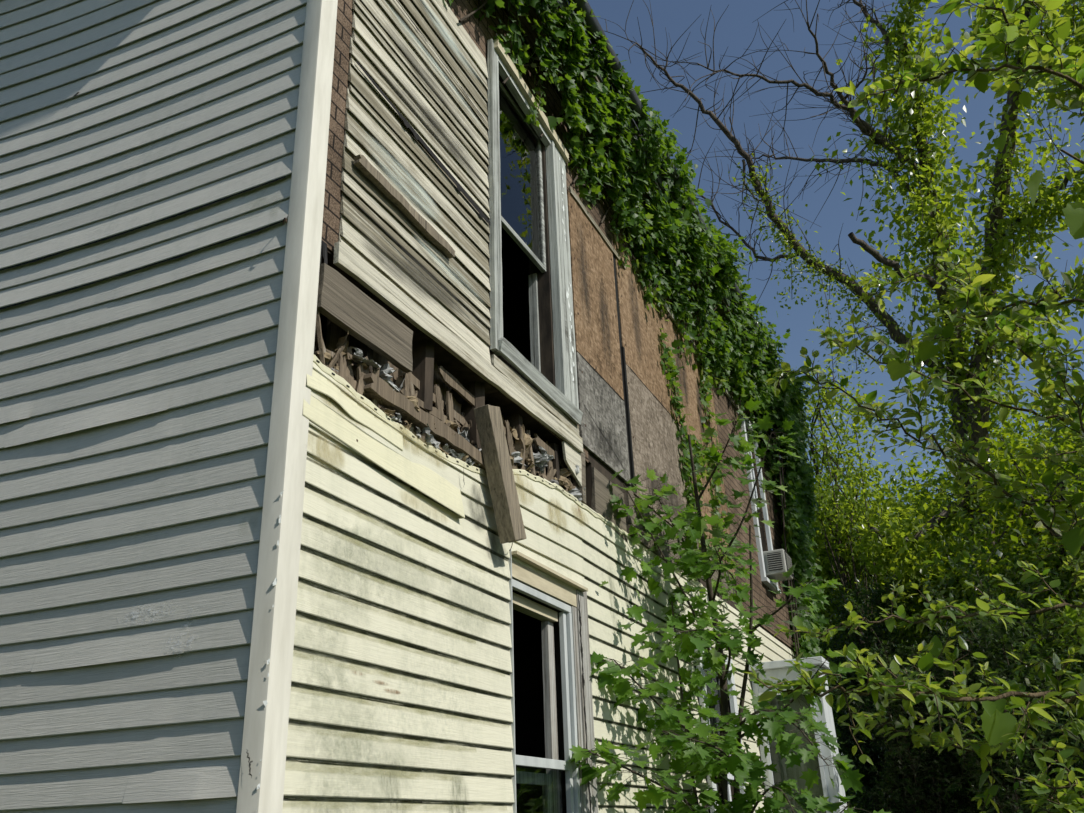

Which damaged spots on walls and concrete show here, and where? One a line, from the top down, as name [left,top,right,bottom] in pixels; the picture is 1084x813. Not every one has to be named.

spalling [314,308,486,470]
peeling [566,282,575,390]
spalling [501,414,586,501]